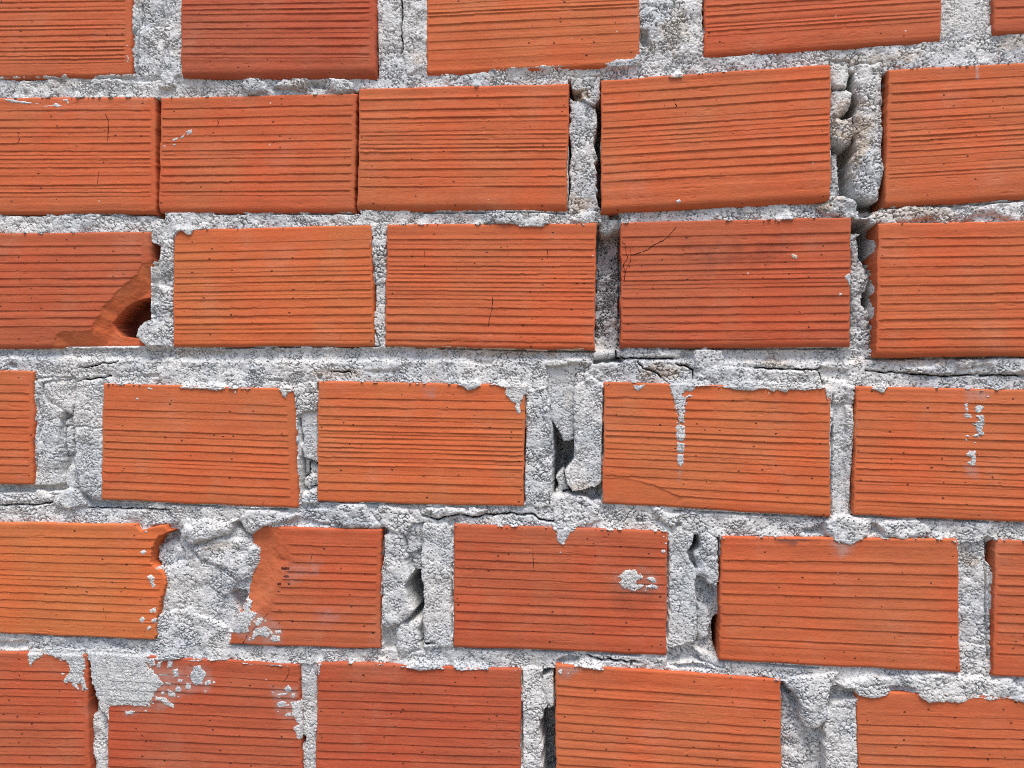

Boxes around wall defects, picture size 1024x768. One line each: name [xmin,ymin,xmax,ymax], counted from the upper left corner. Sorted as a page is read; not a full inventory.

crack [622,227,676,280]
spalling [53,263,153,349]
crack [615,350,693,377]
crack [757,367,822,384]
crack [866,369,1018,377]
peeling [249,617,281,642]